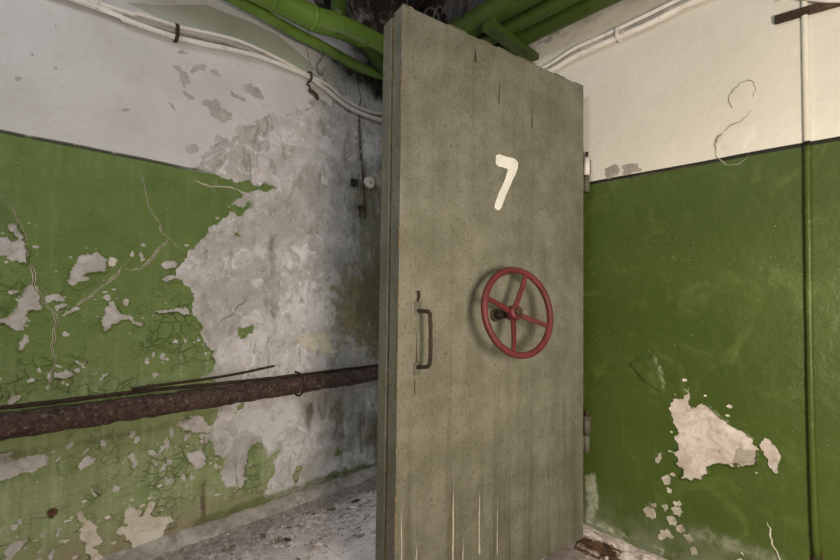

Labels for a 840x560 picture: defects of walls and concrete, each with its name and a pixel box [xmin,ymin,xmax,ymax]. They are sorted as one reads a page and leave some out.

crack [714,80,756,165]
peeling [0,221,39,266]
peeling [0,248,117,353]
crack [0,168,188,392]
crack [193,181,245,194]
peeling [93,64,383,388]
water stain [296,162,382,355]
peeling [0,449,61,483]
peeling [148,380,378,499]
water stain [331,404,378,456]
peeling [643,379,781,556]
peeling [0,488,177,560]